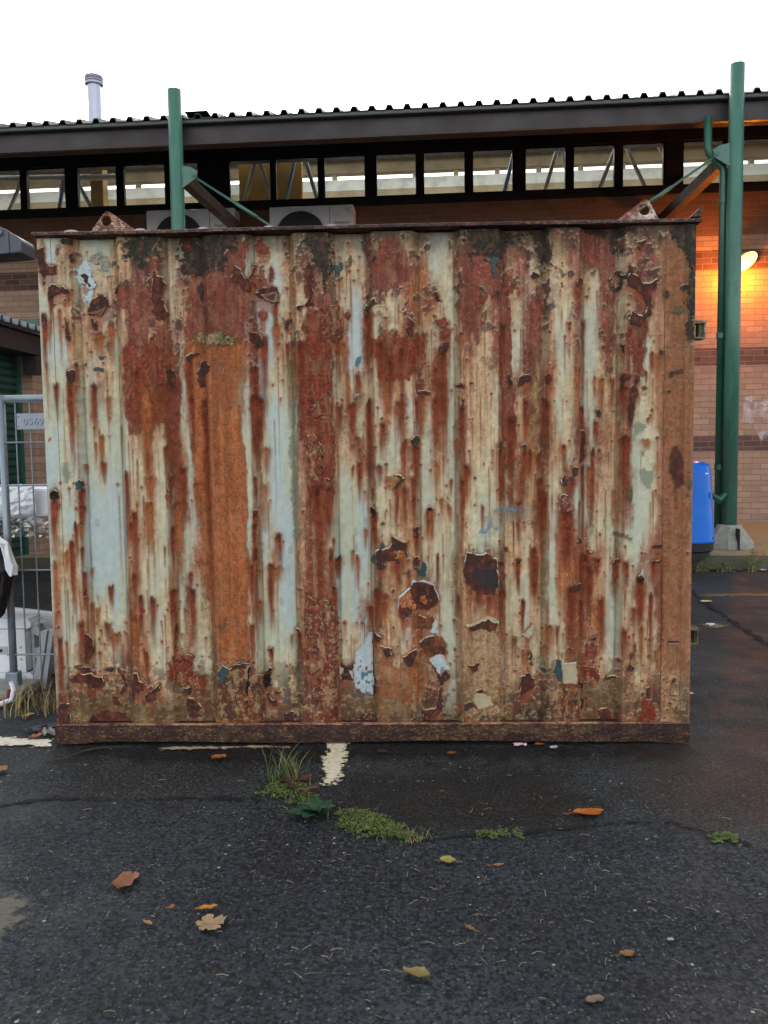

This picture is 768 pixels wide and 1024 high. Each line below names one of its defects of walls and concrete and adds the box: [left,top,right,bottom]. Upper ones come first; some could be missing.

peeling [69,254,96,303]
rust [37,247,75,451]
rust [364,229,694,672]
rust [53,236,471,724]
rust [51,499,60,543]
peeling [414,559,440,600]
rust [421,552,535,720]
peeling [218,662,280,696]
peeling [339,632,374,695]
peeling [473,693,494,709]
peeling [540,659,594,684]
rust [639,686,656,722]